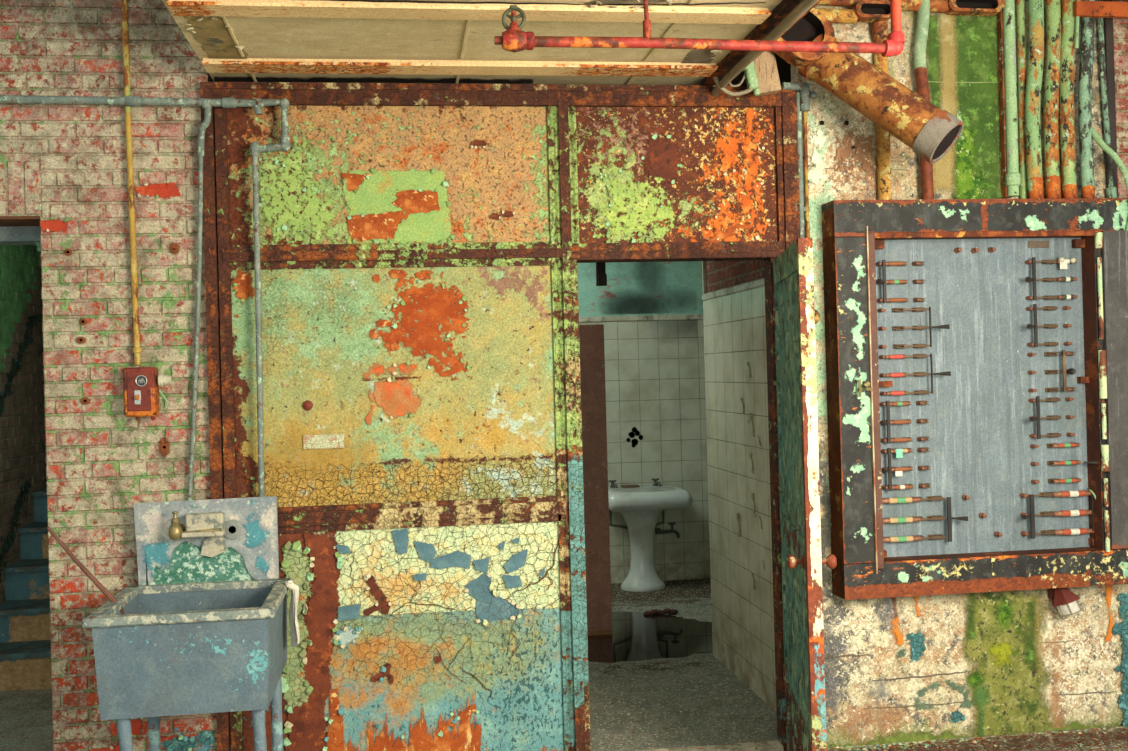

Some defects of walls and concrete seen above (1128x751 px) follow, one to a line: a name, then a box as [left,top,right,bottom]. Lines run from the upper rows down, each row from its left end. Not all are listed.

peeling [250,139,455,248]
corrosion [641,134,684,184]
corrosion [707,109,769,242]
corrosion [370,268,472,382]
crack [270,454,590,698]
peeling [392,529,528,626]
corrosion [890,597,904,646]
peeling [827,593,1128,751]
corrosion [1105,585,1114,642]